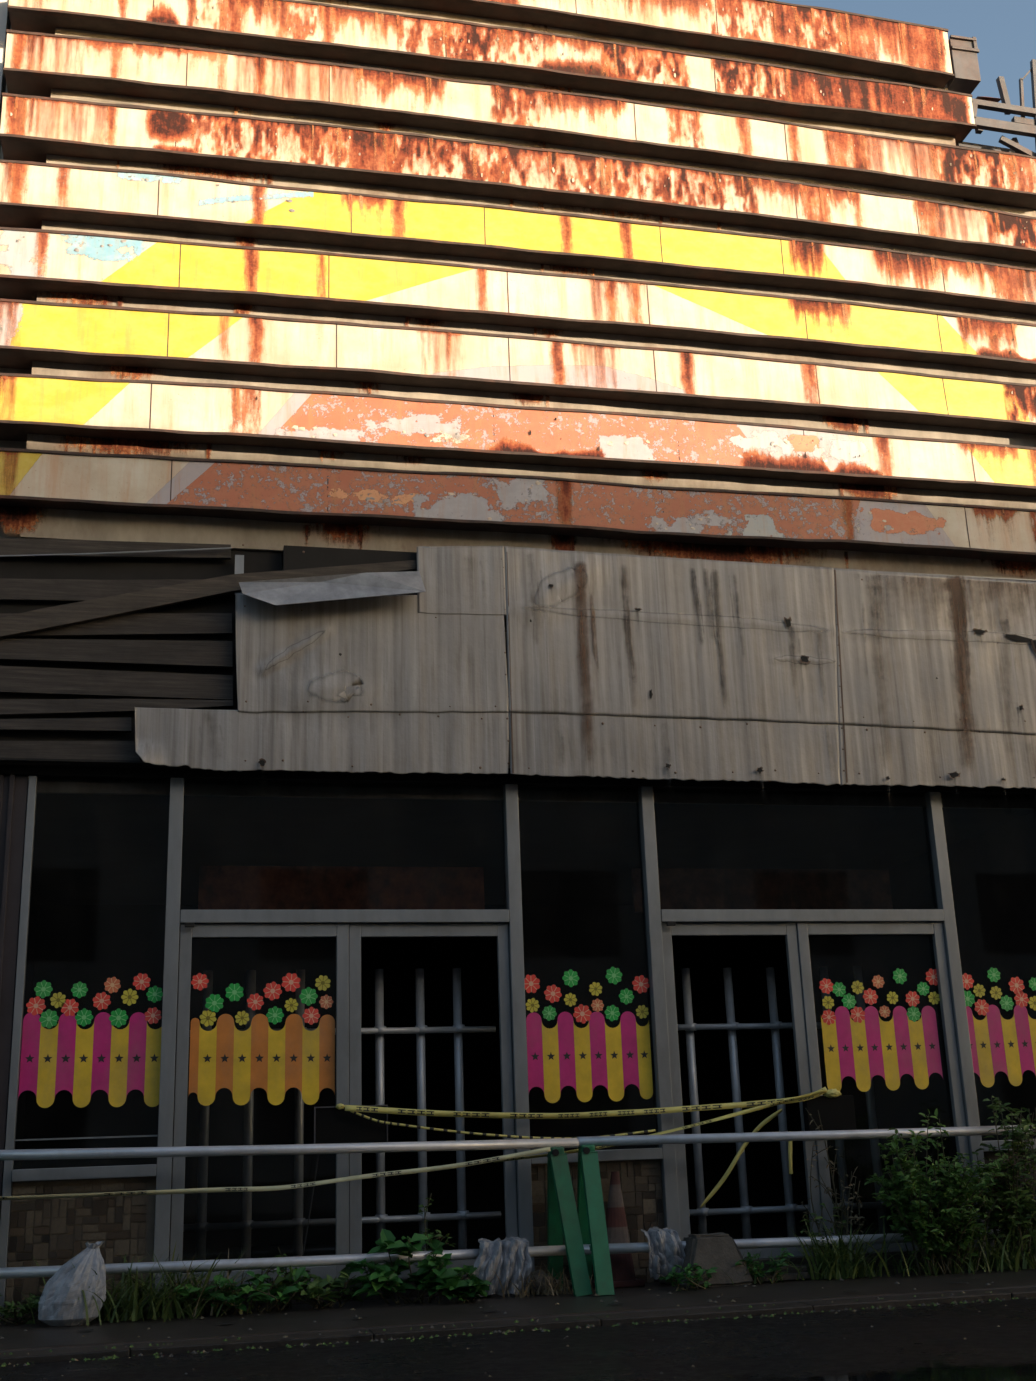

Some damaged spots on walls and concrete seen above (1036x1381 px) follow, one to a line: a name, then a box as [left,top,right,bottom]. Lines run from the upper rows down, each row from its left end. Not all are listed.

corrosion [618,0,947,72]
corrosion [711,59,970,123]
corrosion [5,0,862,363]
corrosion [823,130,1036,192]
corrosion [913,200,1036,249]
corrosion [873,250,1036,302]
corrosion [957,317,1036,362]
corrosion [680,352,695,394]
peeling [596,435,657,460]
peeling [729,430,869,465]
peeling [645,509,786,538]
peeling [860,507,947,535]